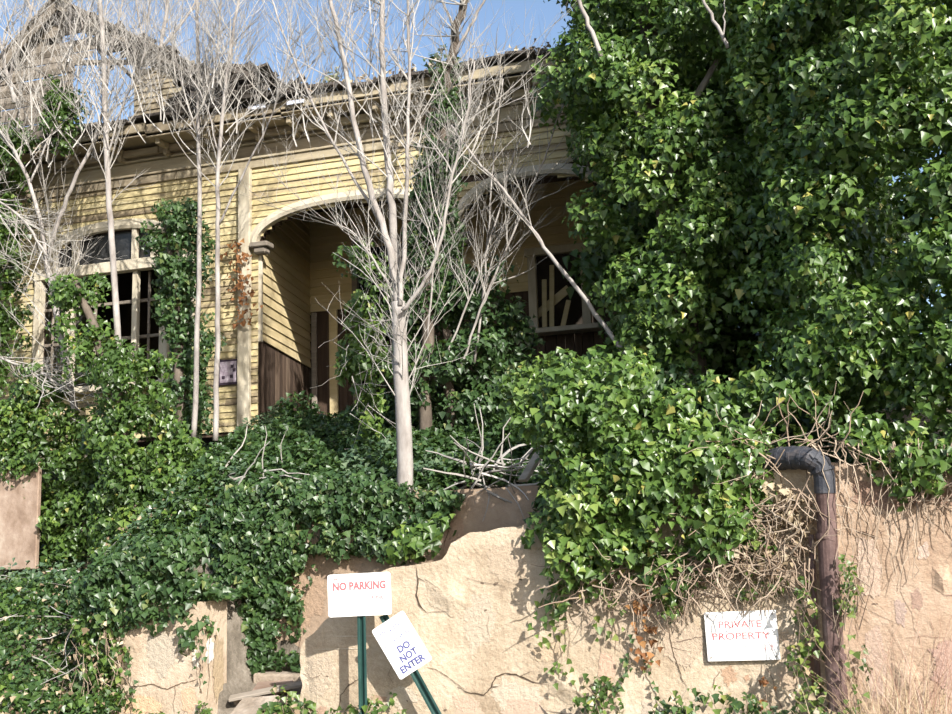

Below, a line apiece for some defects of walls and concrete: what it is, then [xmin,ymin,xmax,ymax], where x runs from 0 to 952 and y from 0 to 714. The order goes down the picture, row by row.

crack [416,568,448,613]
crack [127,635,210,708]
crack [427,667,578,714]